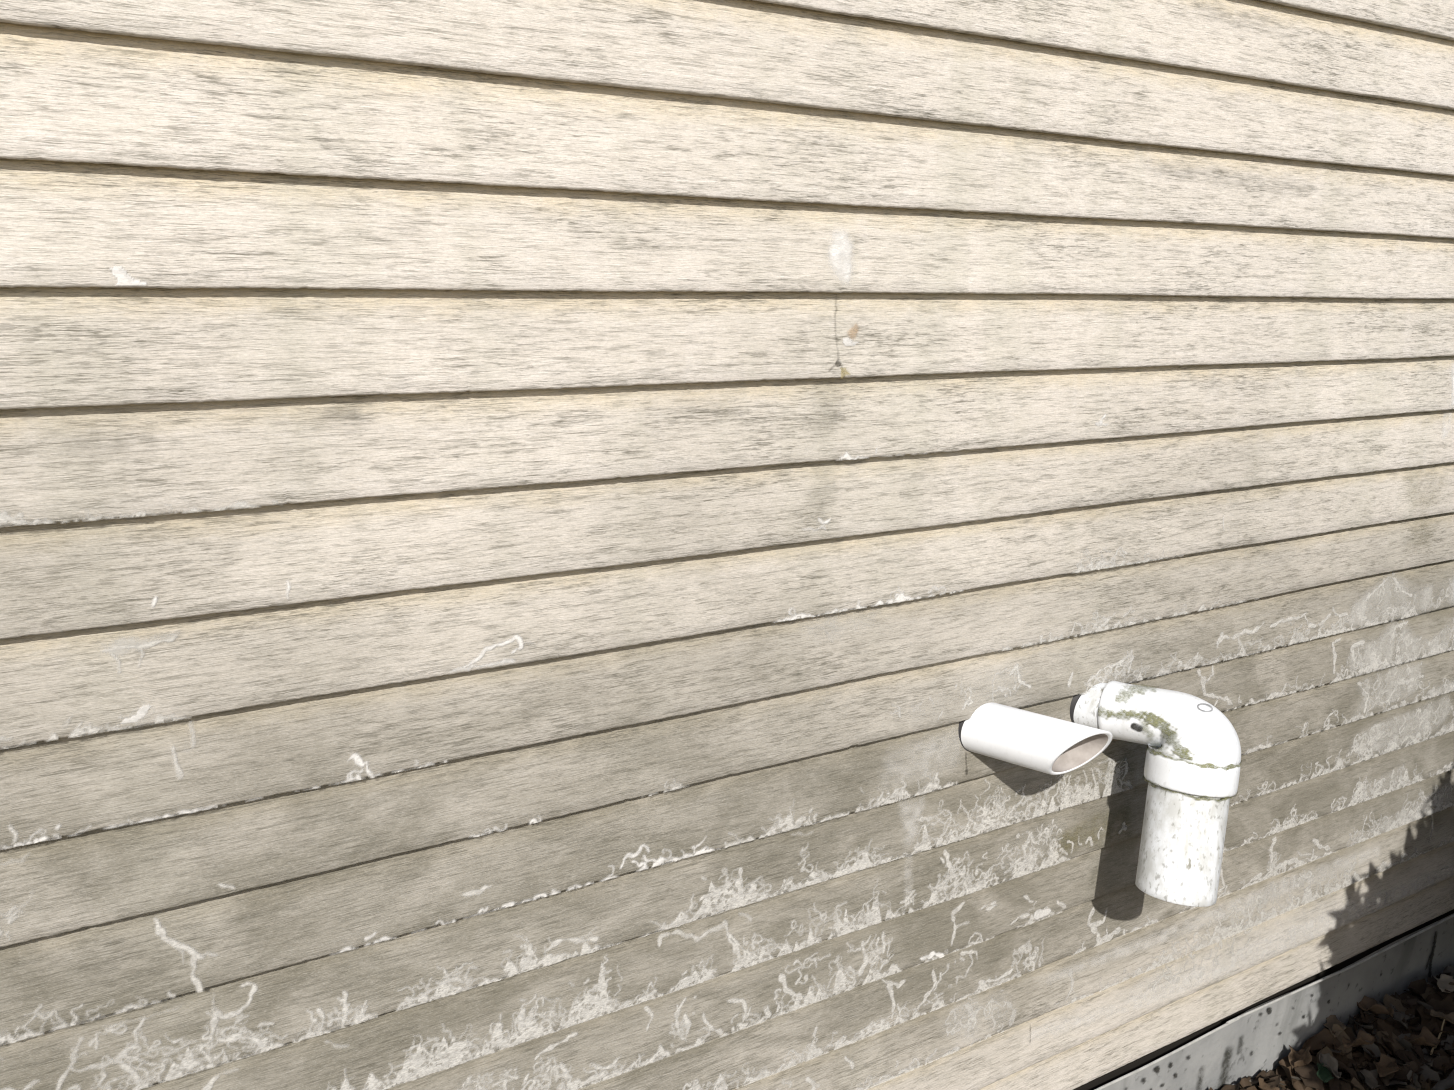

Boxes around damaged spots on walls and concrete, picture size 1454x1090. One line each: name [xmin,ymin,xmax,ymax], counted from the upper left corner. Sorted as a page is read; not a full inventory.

crack [836,328,858,376]
damp [1218,1039,1242,1090]